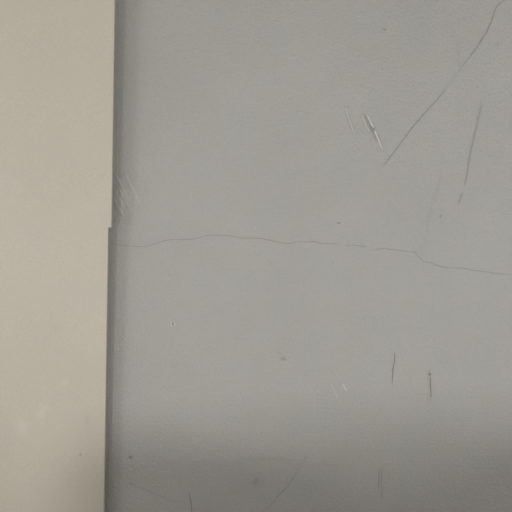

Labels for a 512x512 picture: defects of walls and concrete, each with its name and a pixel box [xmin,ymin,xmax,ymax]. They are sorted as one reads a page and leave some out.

crack [382,0,506,167]
crack [458,101,483,205]
crack [110,234,512,275]